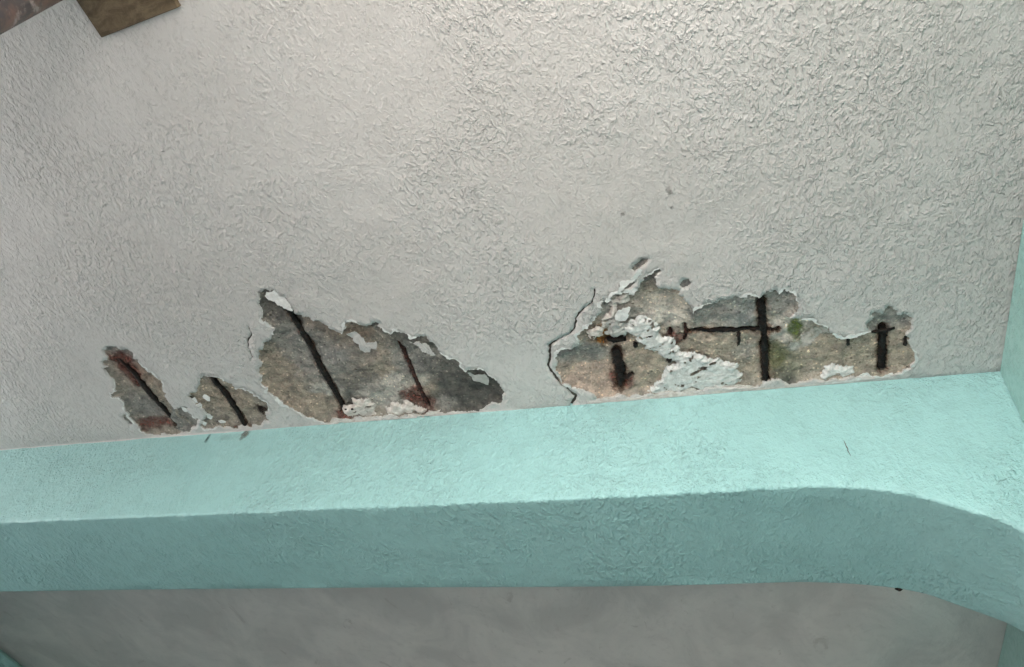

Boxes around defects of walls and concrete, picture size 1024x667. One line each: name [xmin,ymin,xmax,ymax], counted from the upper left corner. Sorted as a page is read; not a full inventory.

spalling [103,289,504,435]
crack [547,289,595,404]
spalling [554,258,919,403]